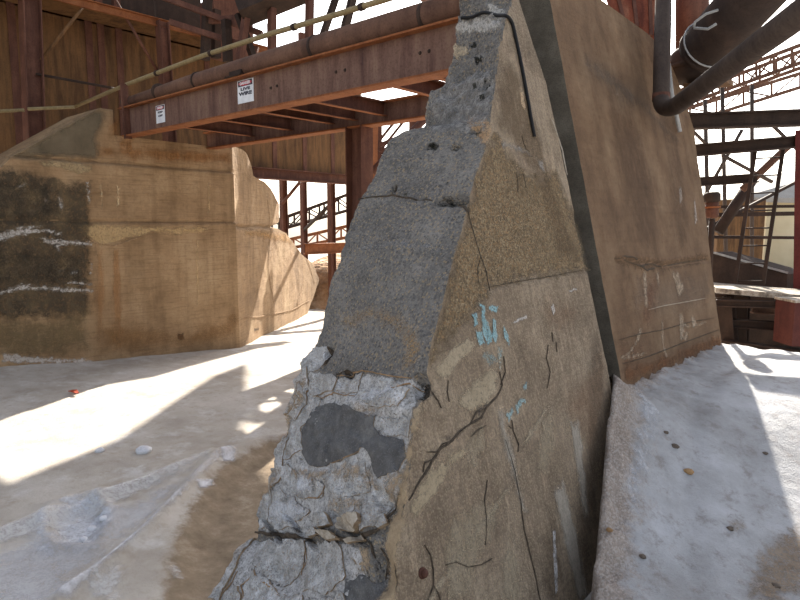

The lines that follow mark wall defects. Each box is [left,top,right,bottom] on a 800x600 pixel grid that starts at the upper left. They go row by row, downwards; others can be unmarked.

water stain [0,170,93,364]
crack [358,185,582,291]
spalling [208,346,430,600]
crack [254,356,506,600]
crack [505,420,541,600]